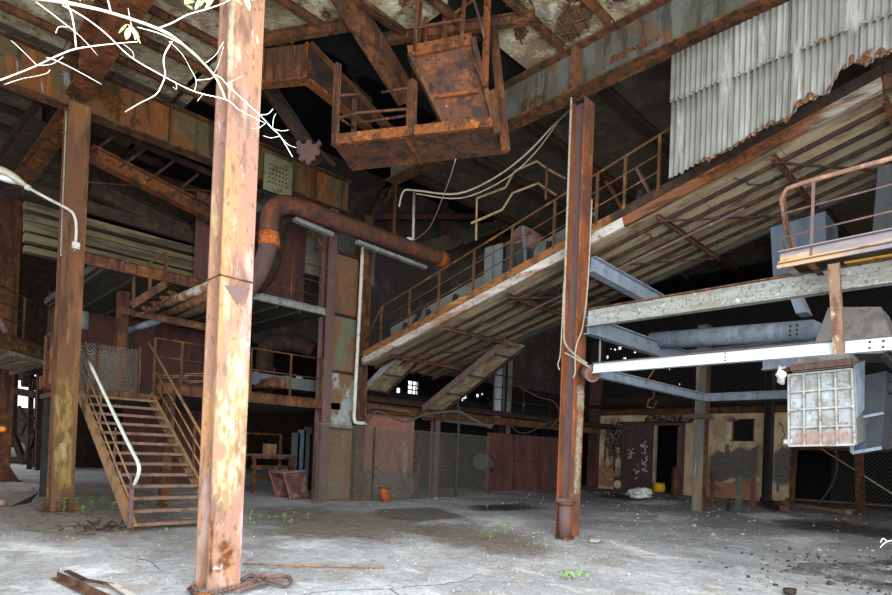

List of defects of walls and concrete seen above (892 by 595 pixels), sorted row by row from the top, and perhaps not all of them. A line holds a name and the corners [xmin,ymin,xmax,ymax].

spalling [554,0,626,45]
corrosion [699,47,892,163]
water stain [707,419,758,499]
corrosion [209,520,233,574]
water stain [261,492,547,554]